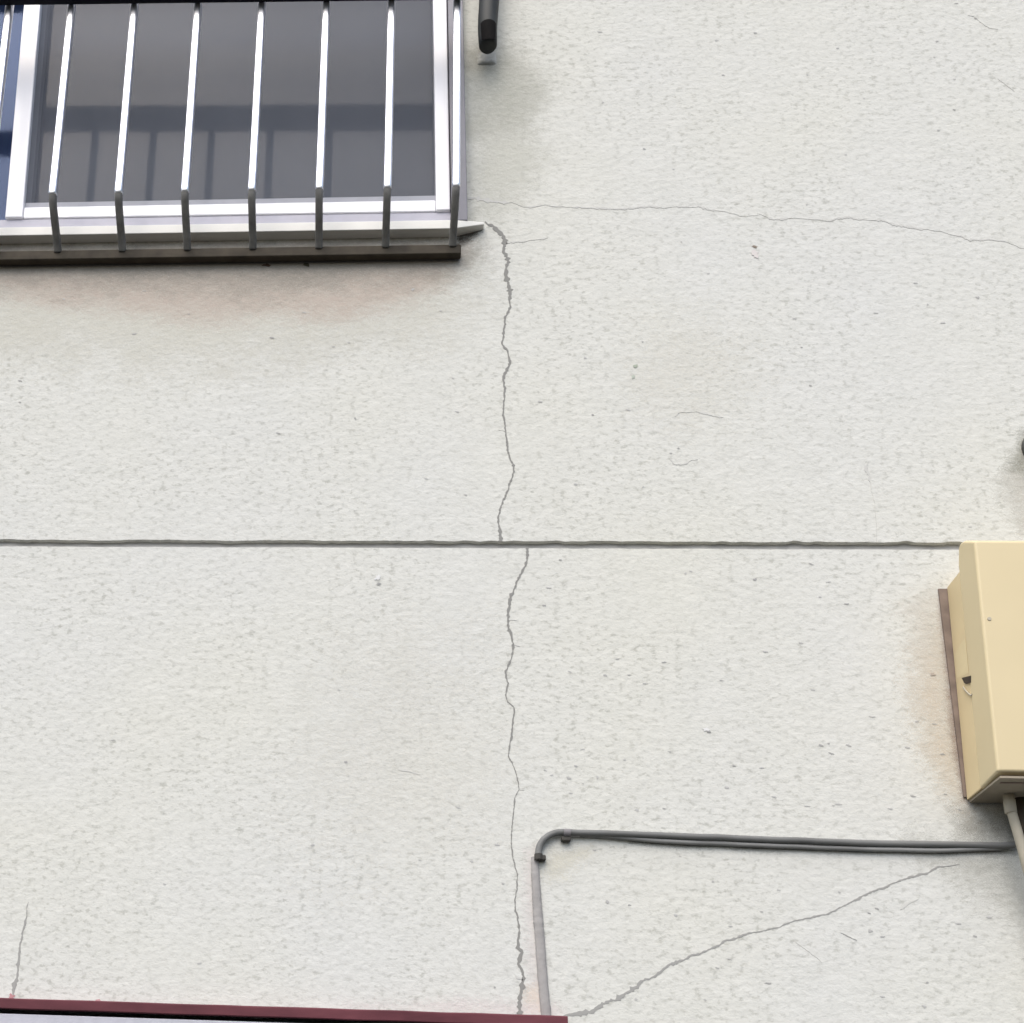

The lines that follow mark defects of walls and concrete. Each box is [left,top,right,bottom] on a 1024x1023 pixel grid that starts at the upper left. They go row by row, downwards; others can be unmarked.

crack [12,904,28,995]
crack [467,196,1024,1017]